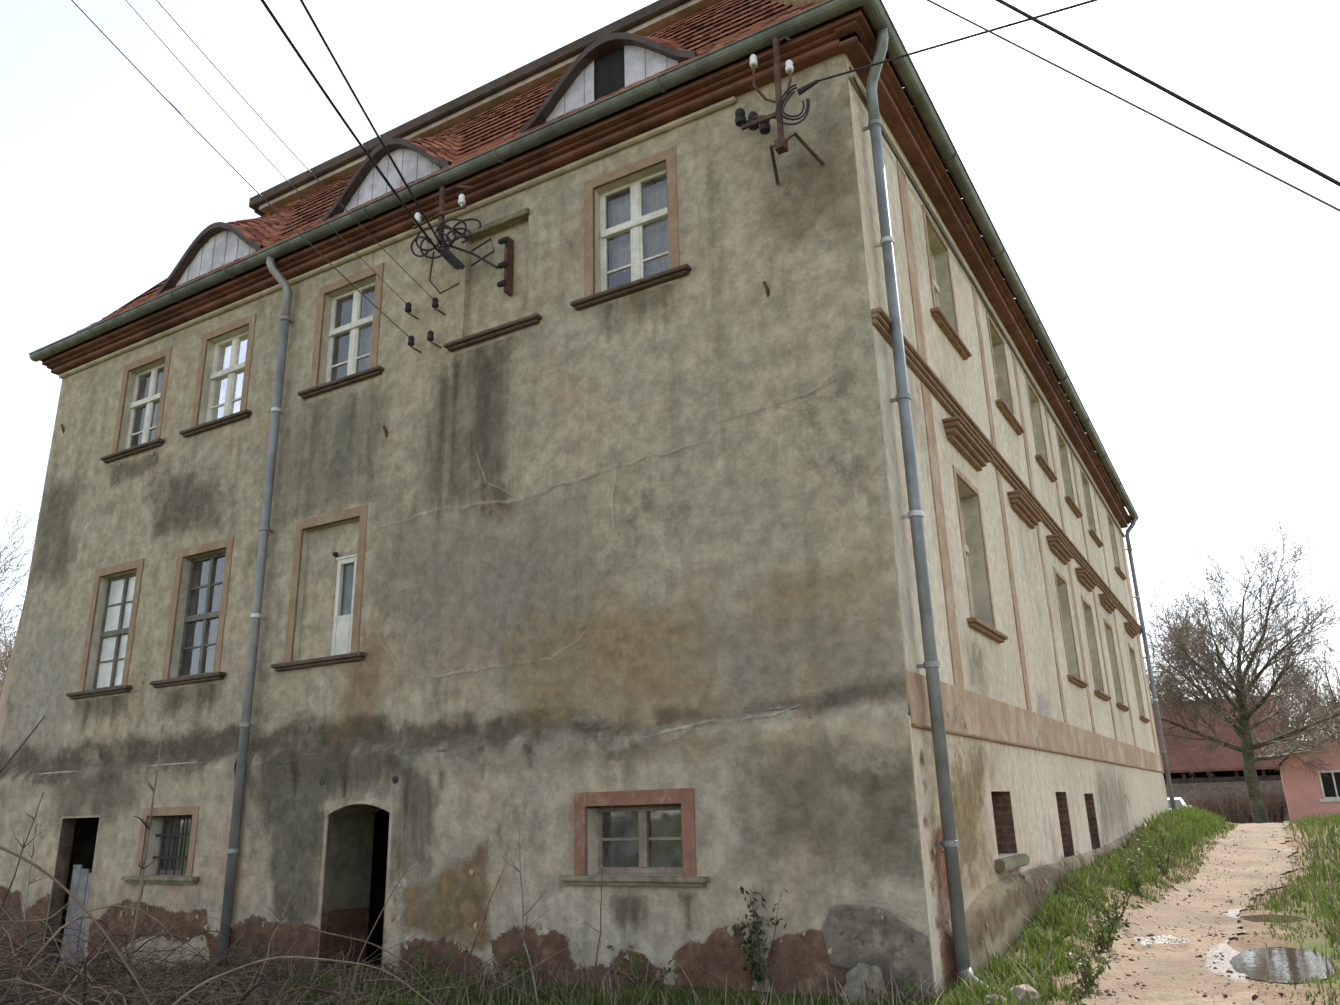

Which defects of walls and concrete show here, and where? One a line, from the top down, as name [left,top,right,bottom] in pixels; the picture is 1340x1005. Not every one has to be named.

water stain [429,343,503,506]
water stain [34,489,73,577]
water stain [154,475,217,535]
water stain [739,636,903,717]
water stain [0,614,687,925]
crack [660,720,711,741]
water stain [932,745,992,896]
peeling [0,881,49,968]
peeling [87,899,318,974]
spalling [390,848,848,996]